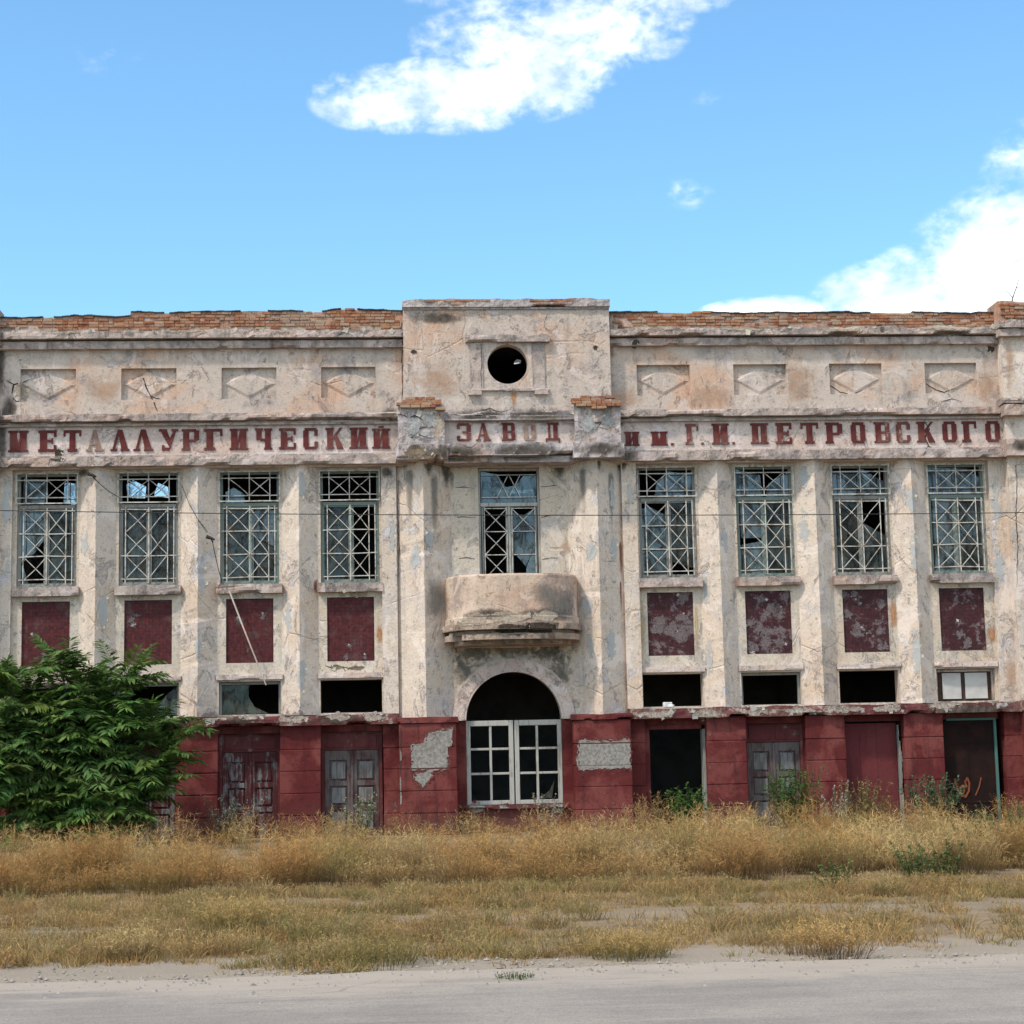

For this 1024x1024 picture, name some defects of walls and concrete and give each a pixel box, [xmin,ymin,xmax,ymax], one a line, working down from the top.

peeling [649,571,710,644]
peeling [746,591,792,654]
damp [453,642,569,684]
peeling [202,711,266,725]
peeling [279,709,308,724]
peeling [324,711,387,722]
peeling [638,709,674,720]
peeling [691,708,721,721]
peeling [736,702,904,716]
peeling [930,700,962,713]
peeling [571,734,633,773]
peeling [398,725,455,804]